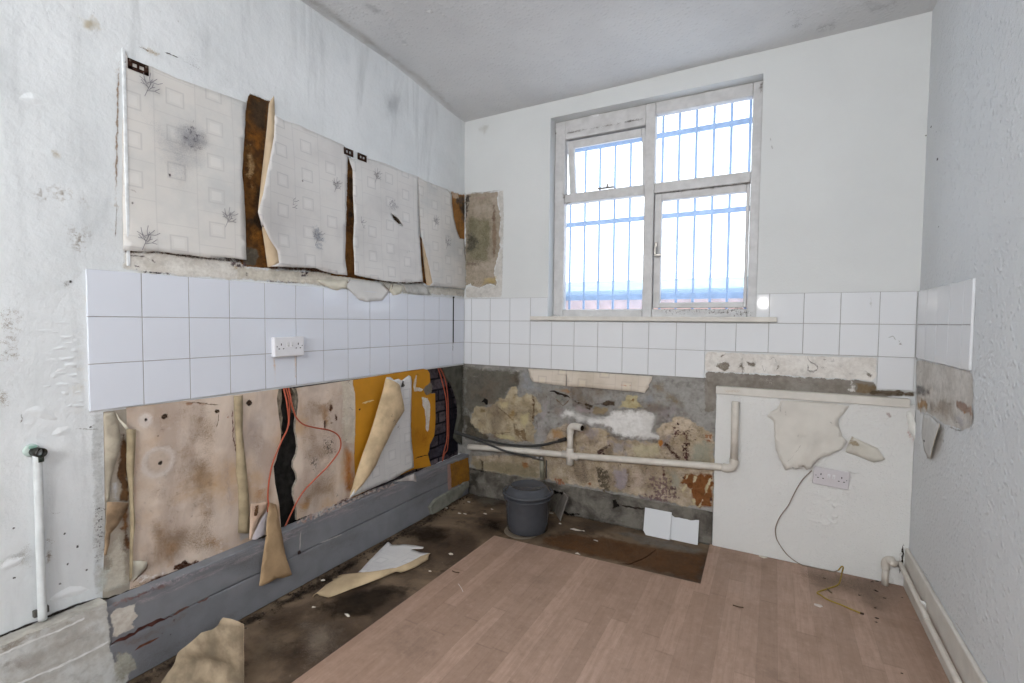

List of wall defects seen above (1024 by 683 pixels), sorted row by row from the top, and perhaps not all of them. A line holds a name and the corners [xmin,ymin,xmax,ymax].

flaking render [121,94,465,297]
flaking render [320,360,973,512]
corrosion [680,472,714,508]
spalling [135,554,217,587]
peeling [249,501,304,586]